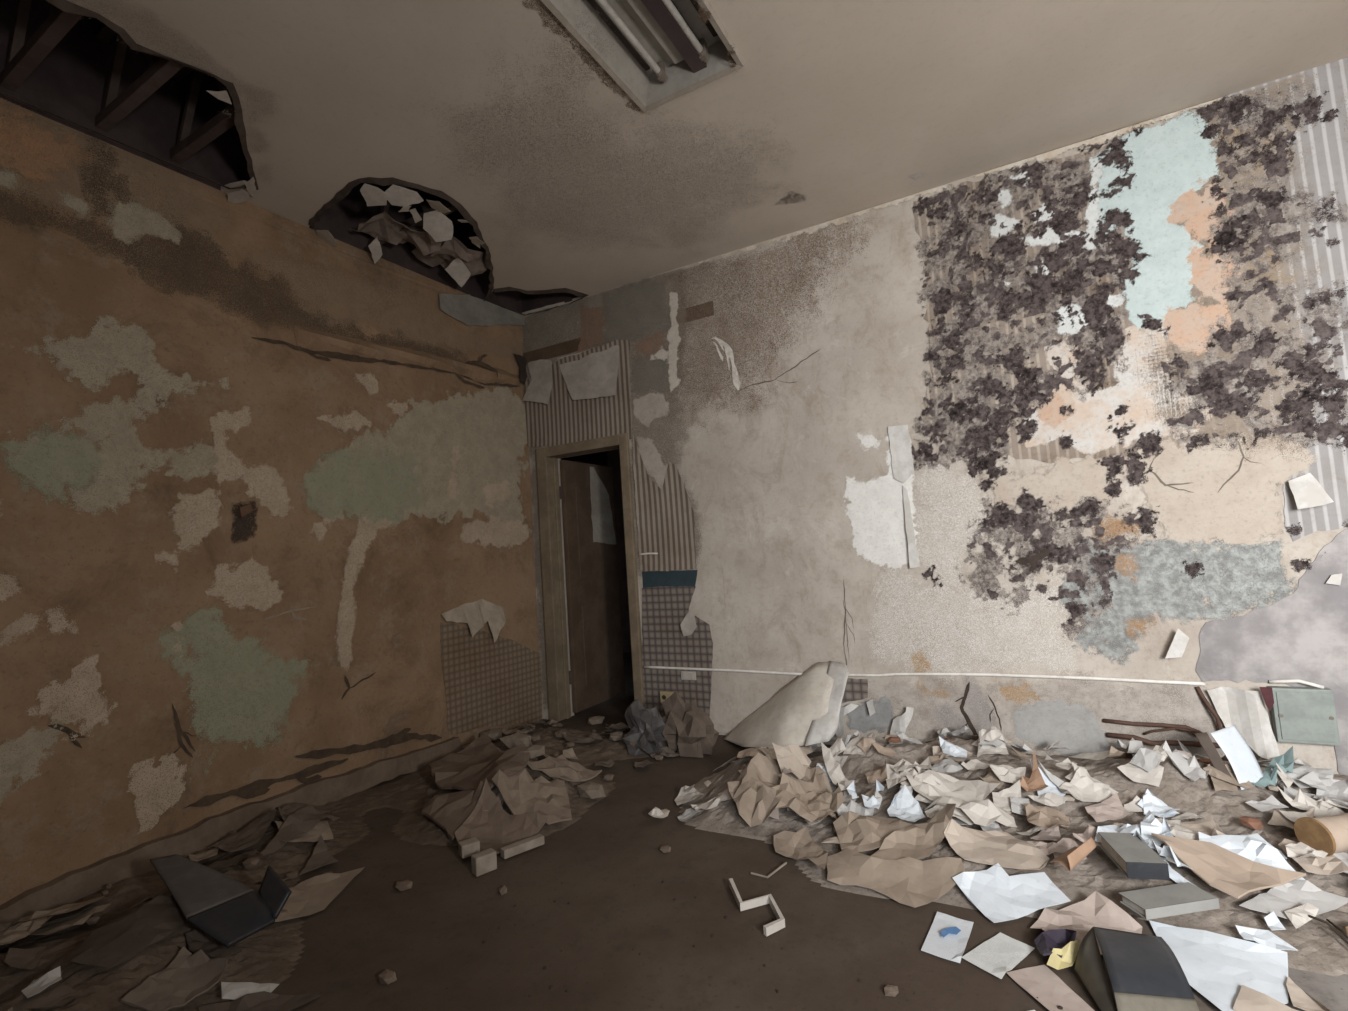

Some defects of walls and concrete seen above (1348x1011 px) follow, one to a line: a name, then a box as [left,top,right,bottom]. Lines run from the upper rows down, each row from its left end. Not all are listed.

peeling [207,91,232,104]
peeling [1,315,298,573]
peeling [369,237,382,264]
crack [252,337,520,389]
peeling [360,184,484,248]
peeling [439,258,525,326]
peeling [633,292,681,489]
peeling [843,425,920,569]
peeling [965,98,1321,546]
flaking render [334,515,395,671]
flaking render [0,654,118,805]
flaking render [126,753,187,835]